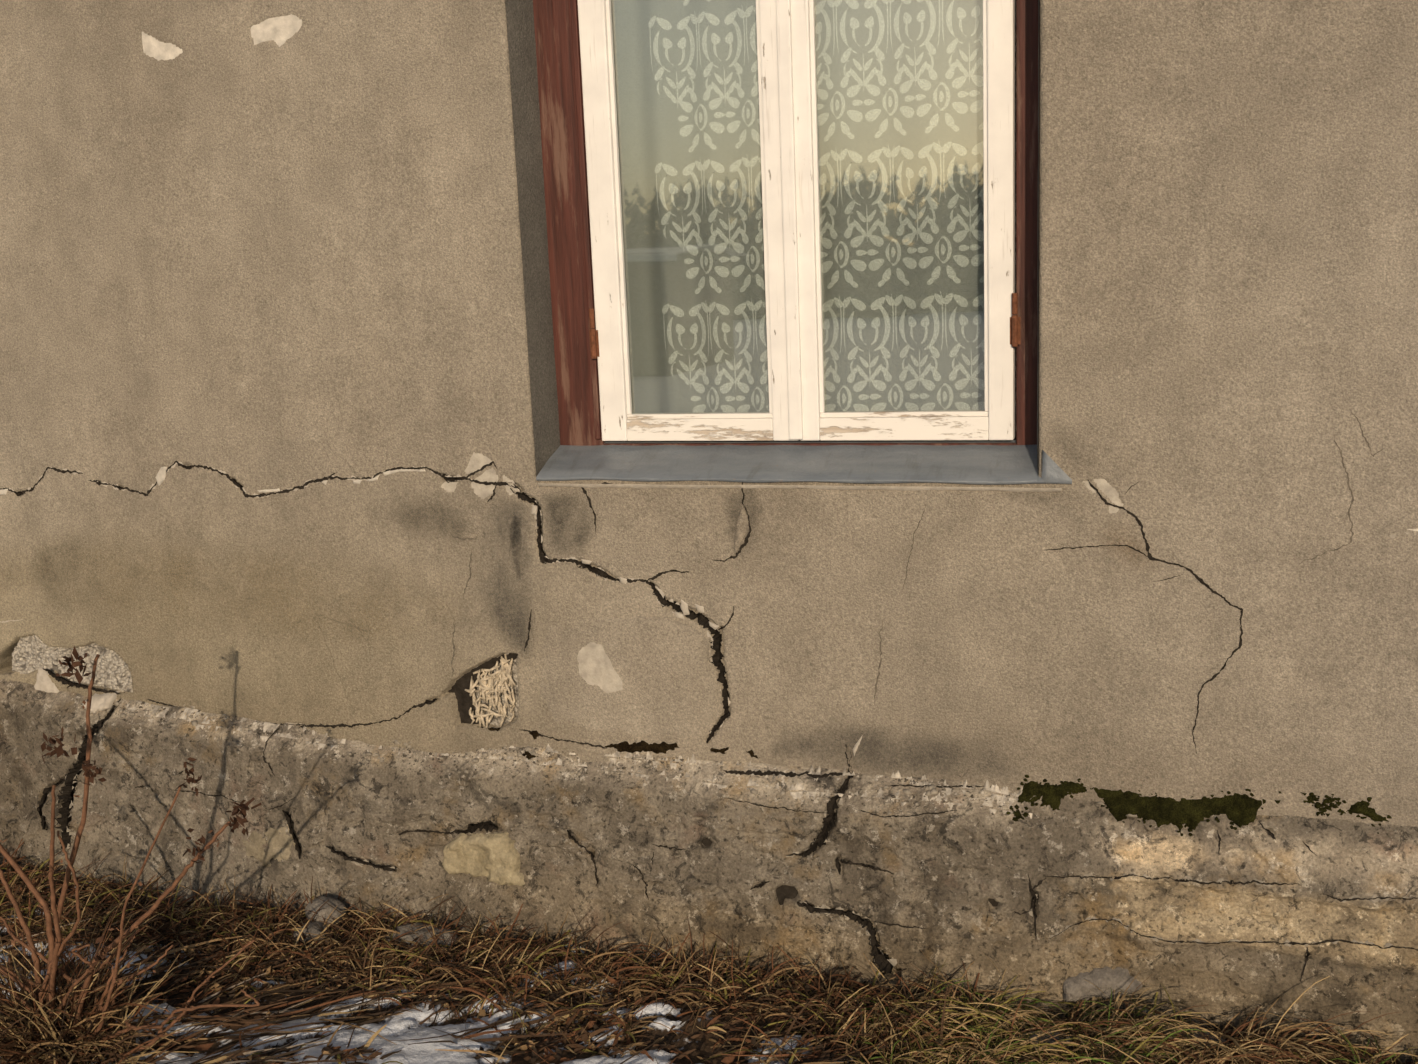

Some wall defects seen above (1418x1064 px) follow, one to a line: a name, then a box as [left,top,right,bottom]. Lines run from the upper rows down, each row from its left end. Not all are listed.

peeling [142,32,183,61]
peeling [251,14,302,47]
crack [1043,480,1243,754]
spalling [12,635,415,756]
spalling [403,653,519,727]
crack [0,461,984,975]
spalling [435,744,1033,819]
crack [1015,822,1418,981]